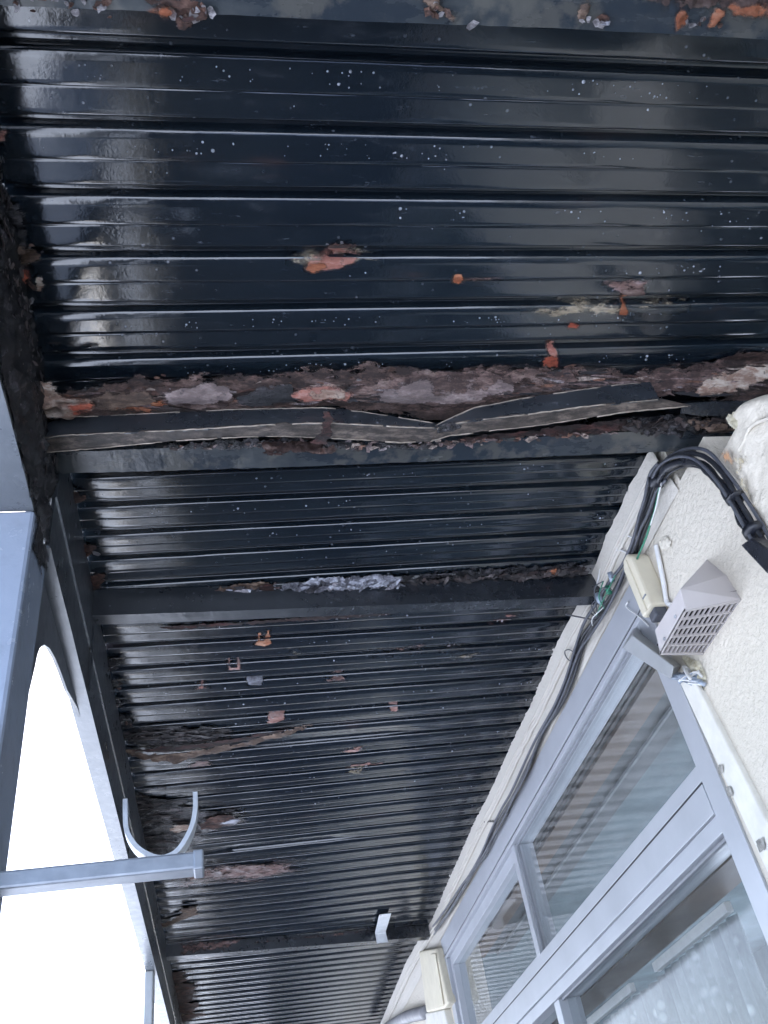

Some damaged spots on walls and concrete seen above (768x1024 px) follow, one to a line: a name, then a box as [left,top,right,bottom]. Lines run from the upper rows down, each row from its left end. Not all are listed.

corrosion [294,241,364,273]
corrosion [452,274,491,284]
corrosion [542,341,558,368]
peeling [208,582,280,593]
peeling [294,565,591,594]
corrosion [255,630,271,646]